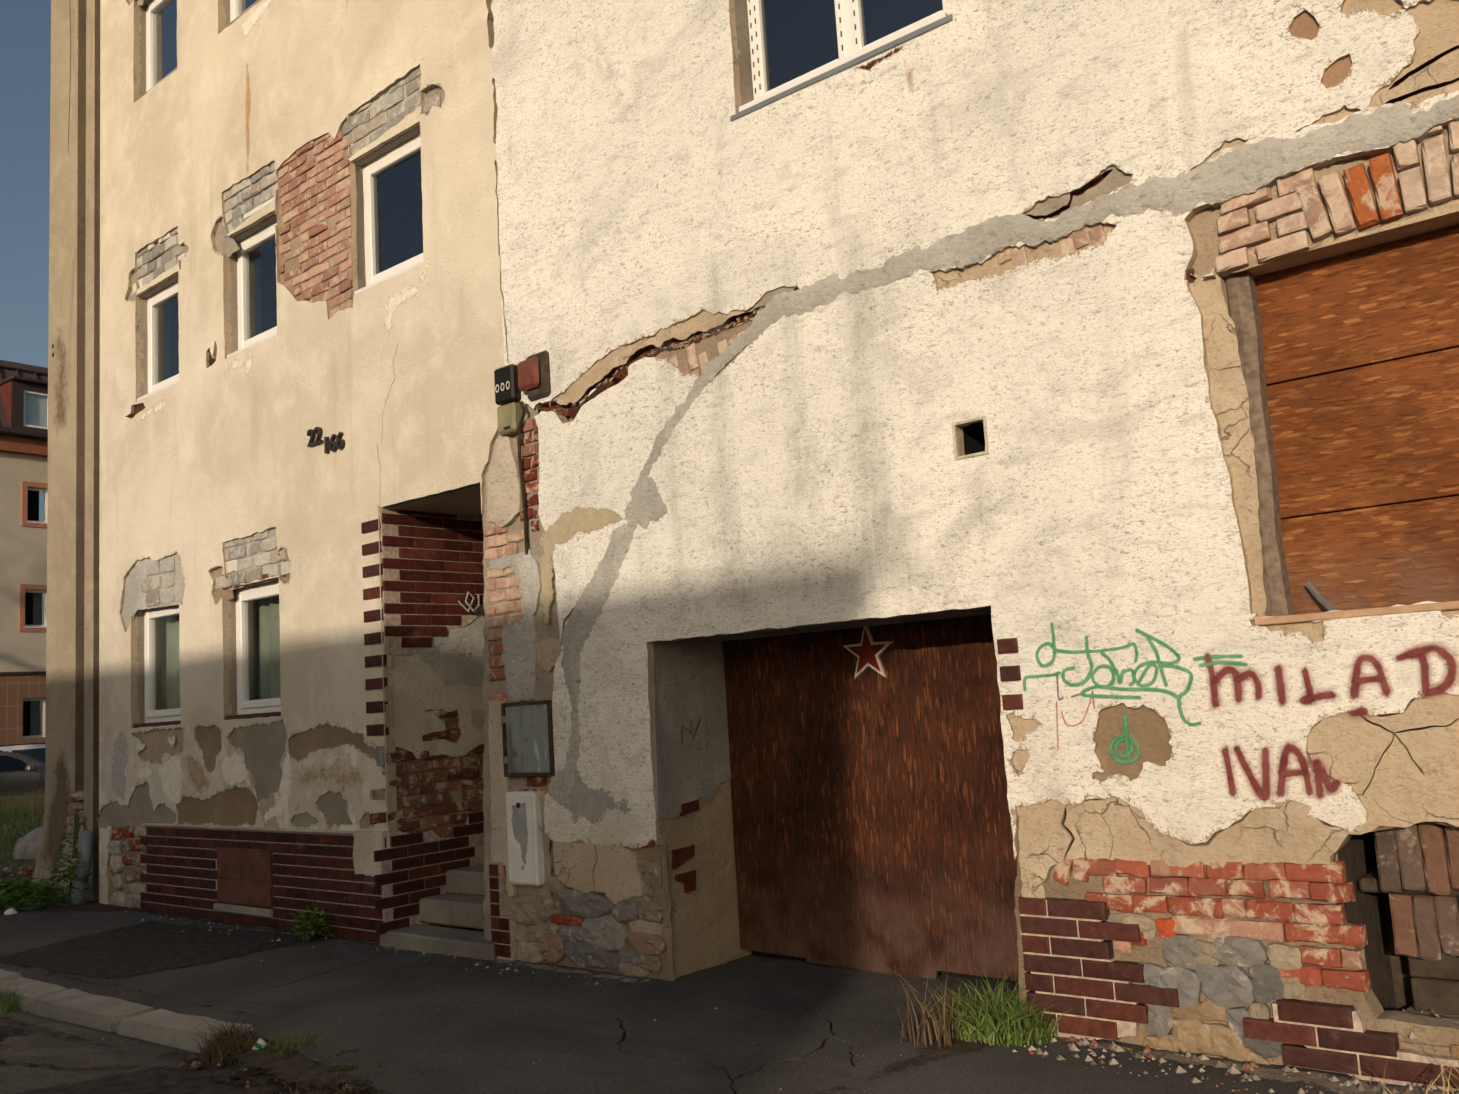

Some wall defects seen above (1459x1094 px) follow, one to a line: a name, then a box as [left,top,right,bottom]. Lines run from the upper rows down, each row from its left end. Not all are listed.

spalling [1287,0,1459,111]
spalling [125,228,189,303]
spalling [211,67,445,318]
crack [1031,178,1104,220]
flaking render [1215,168,1357,278]
flaking render [1393,120,1459,214]
crack [538,286,800,419]
spalling [119,550,186,632]
spalling [209,528,292,603]
spalling [482,402,675,981]
flaking render [59,718,391,908]
spalling [1006,682,1459,1074]